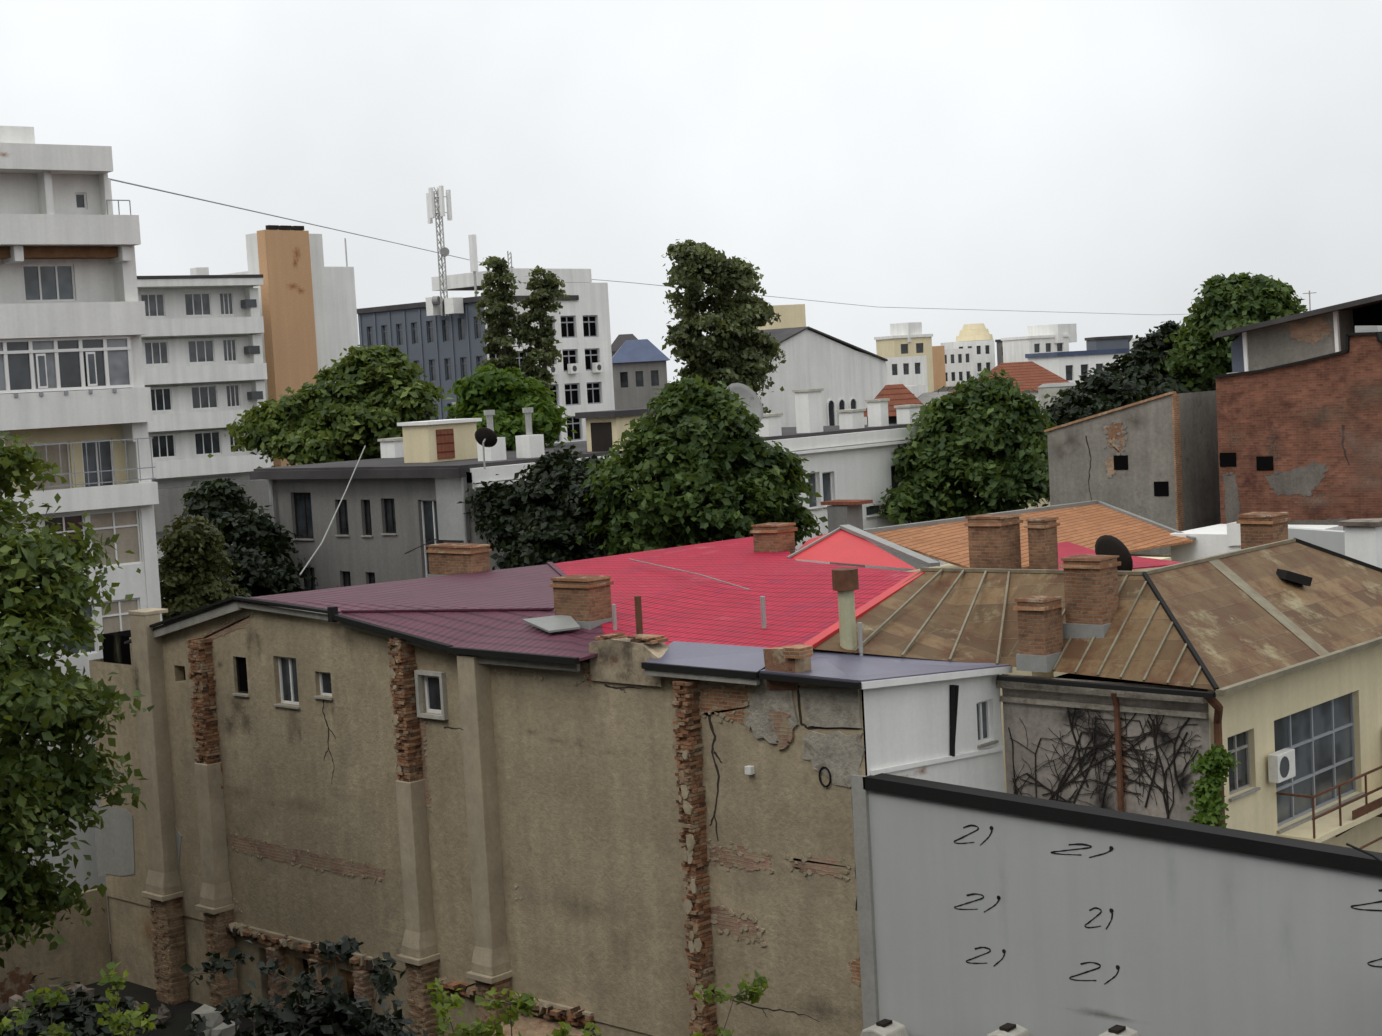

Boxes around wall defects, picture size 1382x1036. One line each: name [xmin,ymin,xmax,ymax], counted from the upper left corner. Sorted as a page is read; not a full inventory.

spalling [1101,420,1128,478]
peeling [1265,462,1330,522]
crack [322,699,336,784]
spalling [387,636,433,812]
spalling [671,679,767,1036]
spalling [784,853,851,880]